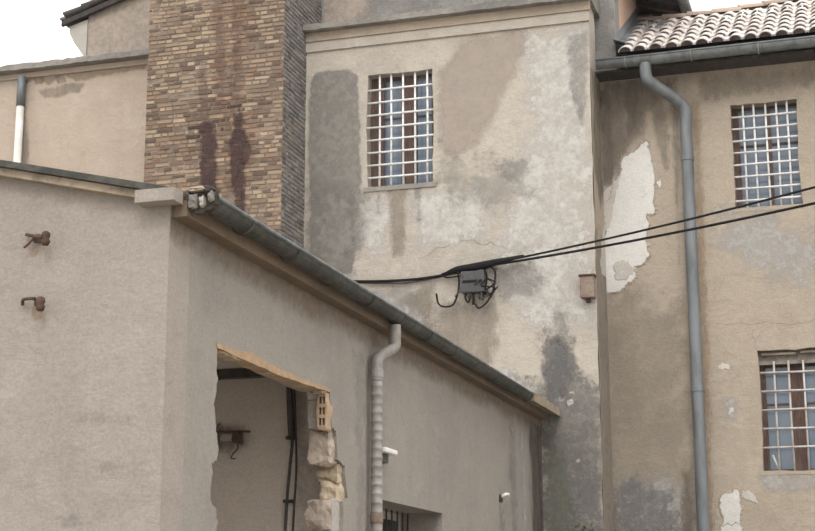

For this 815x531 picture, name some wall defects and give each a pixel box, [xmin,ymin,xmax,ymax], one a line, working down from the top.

water stain [306,71,370,273]
flaking render [600,138,661,295]
spalling [216,342,345,531]
water stain [514,230,685,531]
flaking render [718,487,758,531]